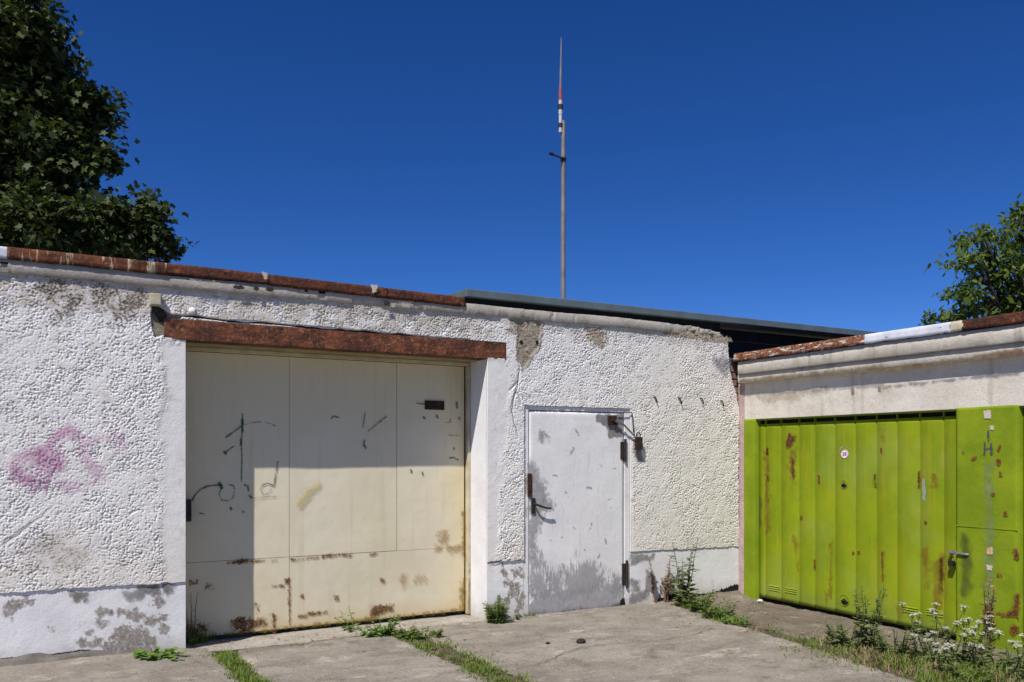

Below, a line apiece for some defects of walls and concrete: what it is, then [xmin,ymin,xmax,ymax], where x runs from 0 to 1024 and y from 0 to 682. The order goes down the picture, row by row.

spalling [507,318,544,372]
spalling [584,326,609,349]
corrosion [785,433,796,479]
peeling [500,461,630,615]
peeling [3,595,35,621]
peeling [75,583,170,650]
corrosion [231,577,327,634]
corrosion [370,604,395,618]